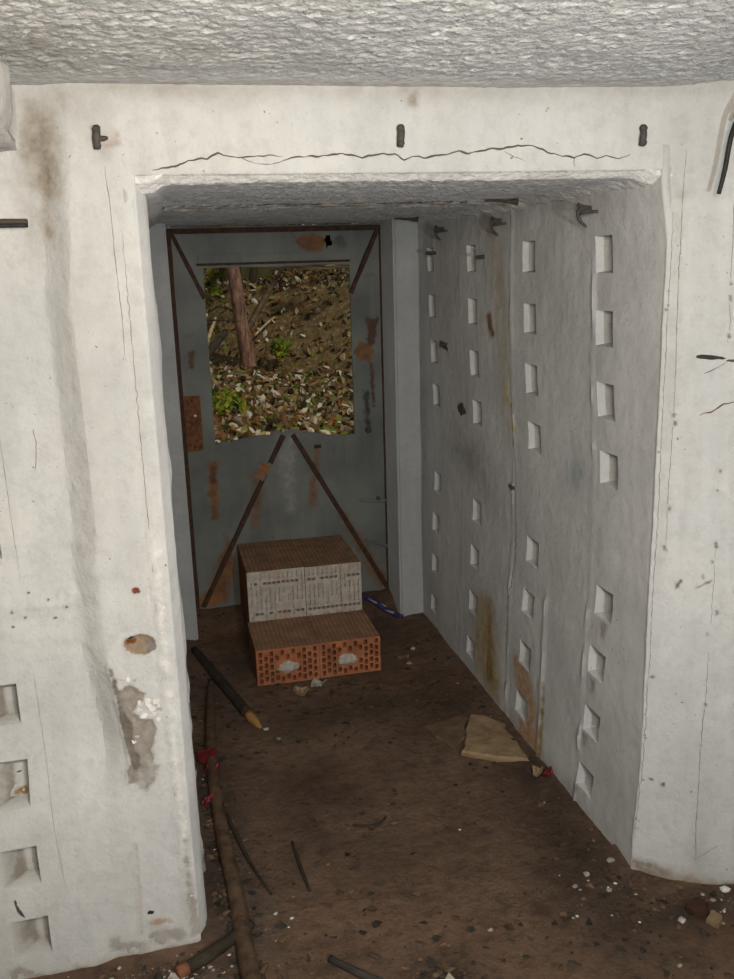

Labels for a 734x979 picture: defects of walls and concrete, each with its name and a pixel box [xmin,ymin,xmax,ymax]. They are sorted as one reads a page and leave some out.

damp [11,89,73,247]
crack [155,145,631,170]
corrosion [351,315,381,409]
peeling [105,234,201,959]